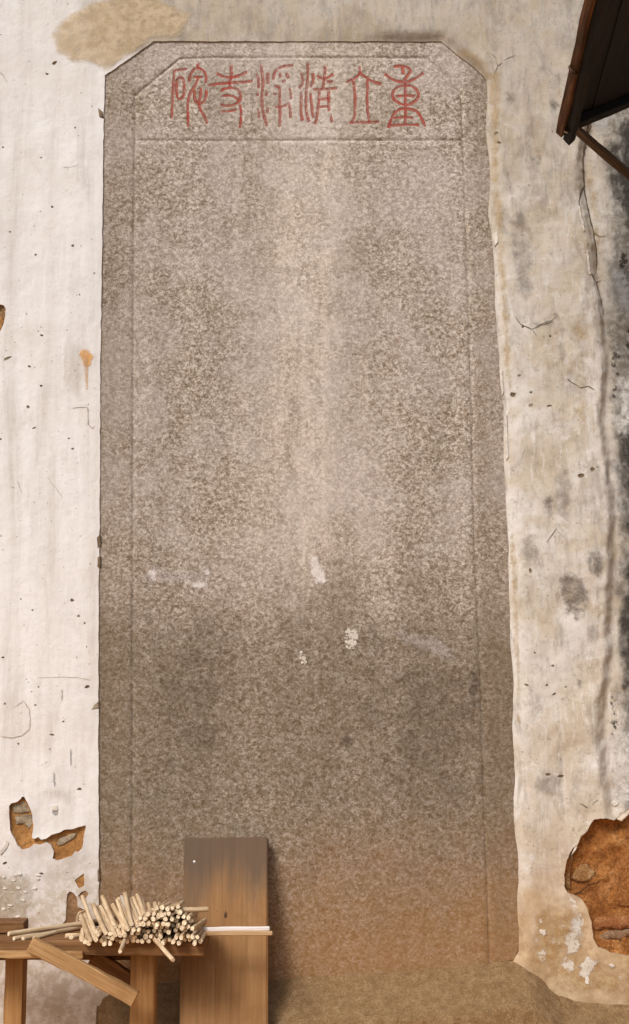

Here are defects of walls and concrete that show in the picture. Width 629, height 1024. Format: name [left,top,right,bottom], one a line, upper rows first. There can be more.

crack [579,124,607,314]
damp [610,122,629,226]
damp [613,253,629,310]
corrosion [80,350,93,385]
damp [612,329,629,490]
damp [561,577,585,619]
damp [619,595,629,688]
damp [611,702,629,806]
spalling [10,797,86,860]
spalling [532,809,629,991]